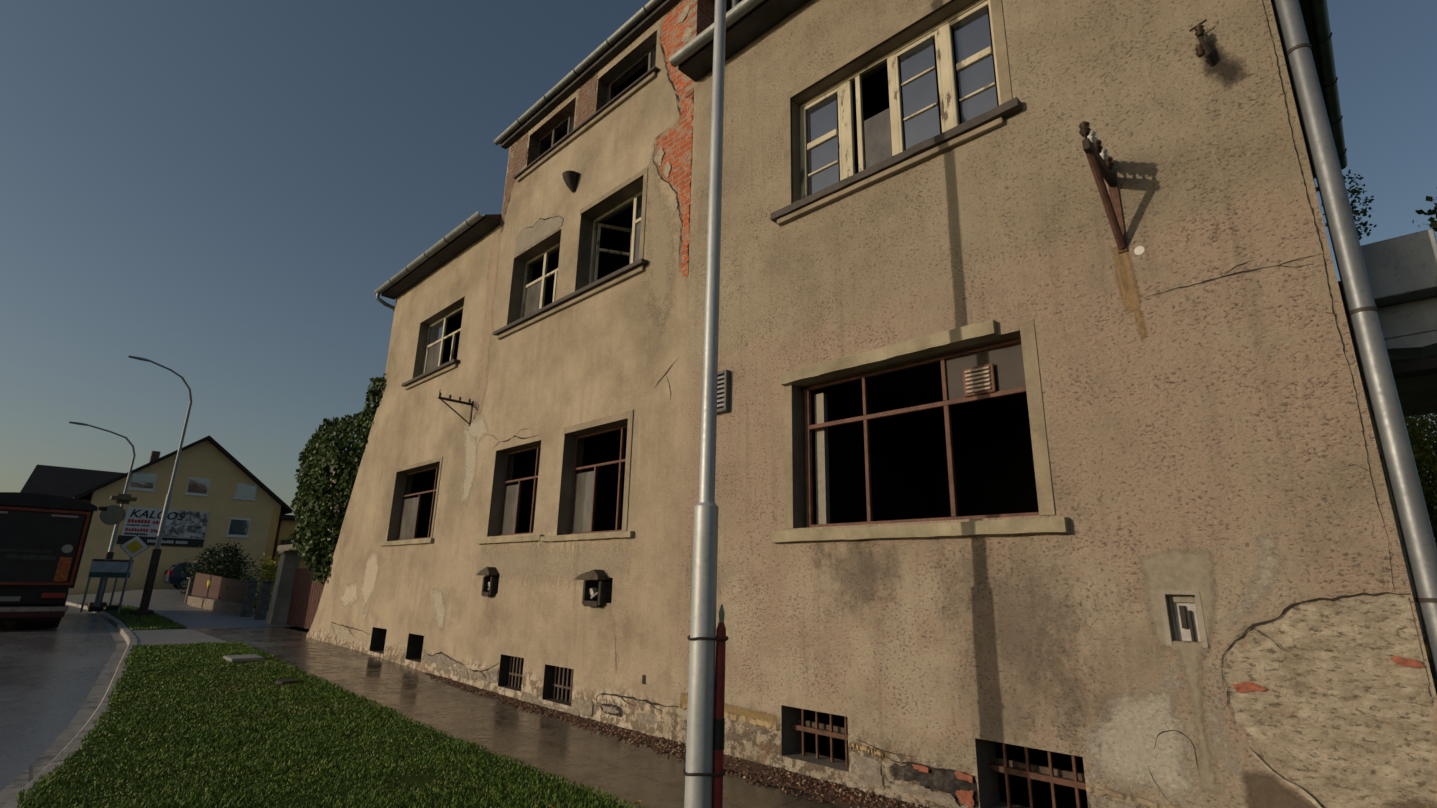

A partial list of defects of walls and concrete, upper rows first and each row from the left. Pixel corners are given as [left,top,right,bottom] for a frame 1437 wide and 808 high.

leakage [1204,42,1244,84]
flaking render [644,0,694,332]
corrosion [1114,248,1146,338]
crack [1147,0,1394,586]
peeling [328,552,379,648]
spalling [423,650,498,683]
spalling [1221,591,1437,808]
spalling [849,751,979,808]